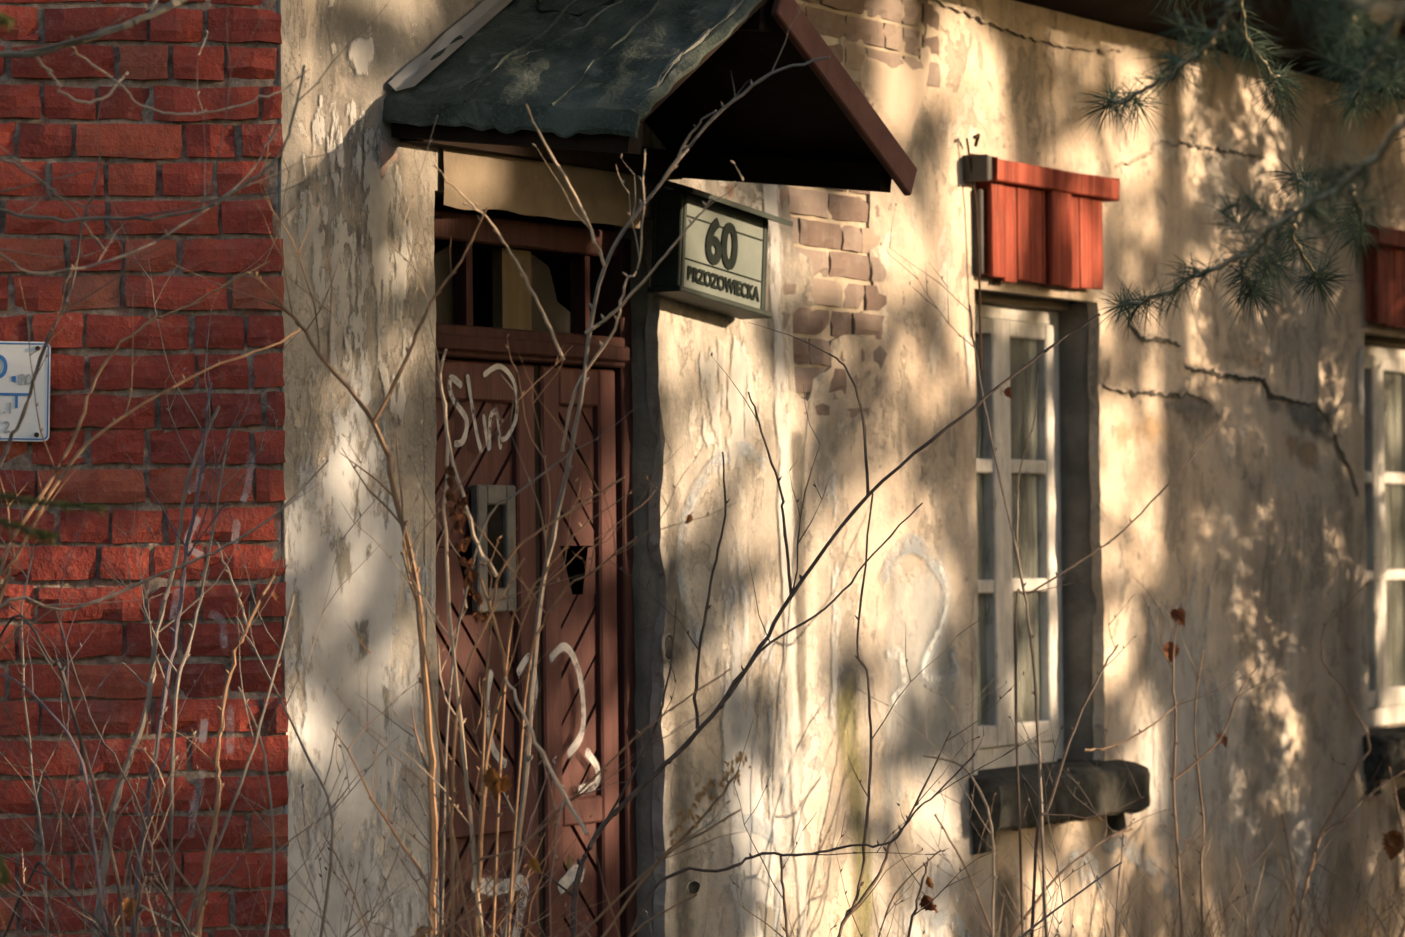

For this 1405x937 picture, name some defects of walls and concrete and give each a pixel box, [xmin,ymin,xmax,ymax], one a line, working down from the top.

flaking render [797,0,941,107]
crack [1116,138,1266,167]
crack [1105,324,1359,498]
flaking render [697,184,887,937]